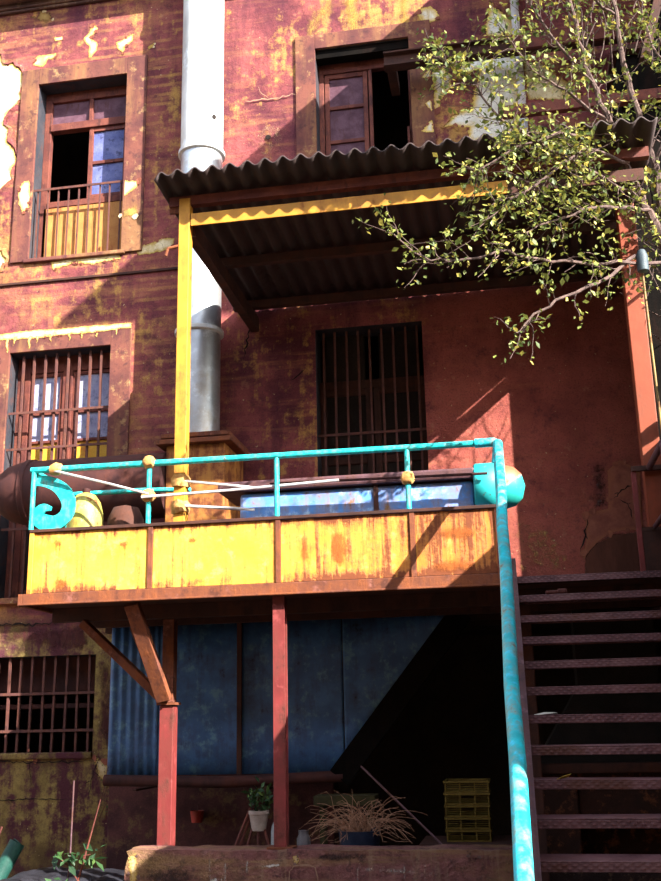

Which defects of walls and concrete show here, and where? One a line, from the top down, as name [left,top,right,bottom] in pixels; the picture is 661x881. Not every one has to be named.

flaking render [414,6,440,23]
flaking render [479,0,513,39]
flaking render [84,23,99,57]
flaking render [116,34,134,55]
flaking render [422,57,582,140]
flaking render [0,47,57,215]
flaking render [0,248,10,273]
corrosion [332,533,346,563]
crack [0,620,57,628]
water stain [99,667,110,745]